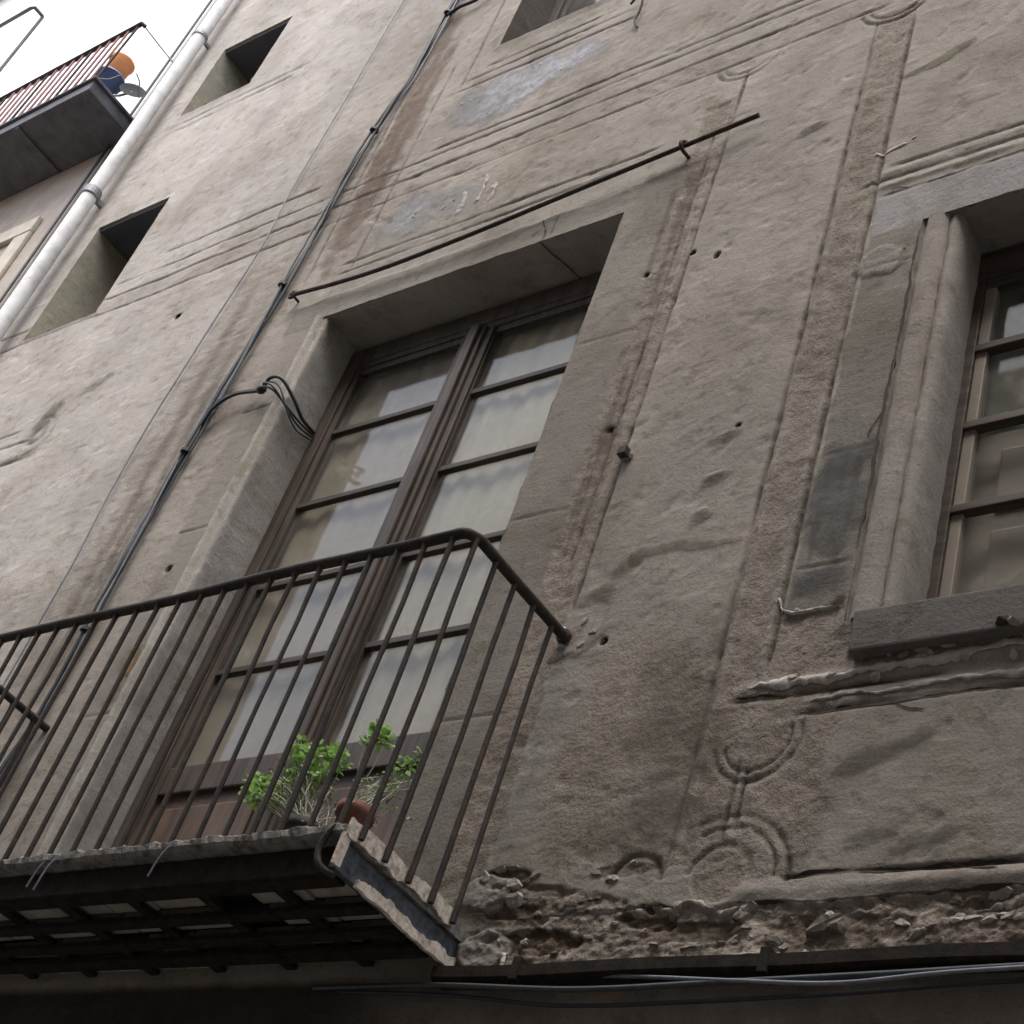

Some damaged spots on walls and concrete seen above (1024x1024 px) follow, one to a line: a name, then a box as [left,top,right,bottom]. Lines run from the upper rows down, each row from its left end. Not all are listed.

spalling [745,615,1024,702]
spalling [476,864,593,957]
spalling [591,869,619,884]
spalling [610,886,1024,956]